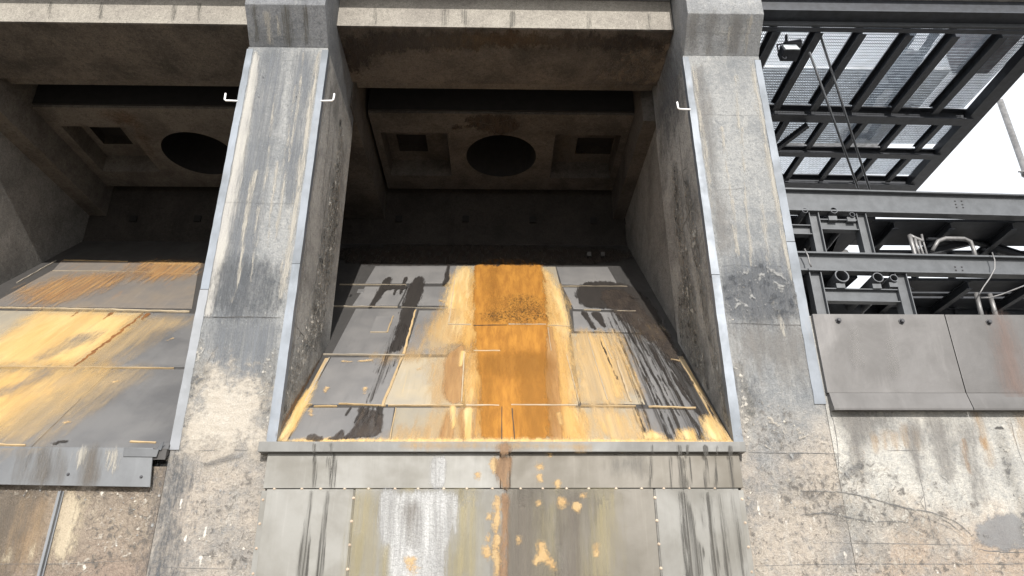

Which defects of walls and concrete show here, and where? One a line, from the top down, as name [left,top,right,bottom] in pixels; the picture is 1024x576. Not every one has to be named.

corrosion [0,260,201,433]
damp [298,276,425,576]
damp [379,456,458,576]
corrosion [276,262,733,576]
damp [575,281,744,576]
crack [752,411,1024,566]
damp [977,514,1024,551]